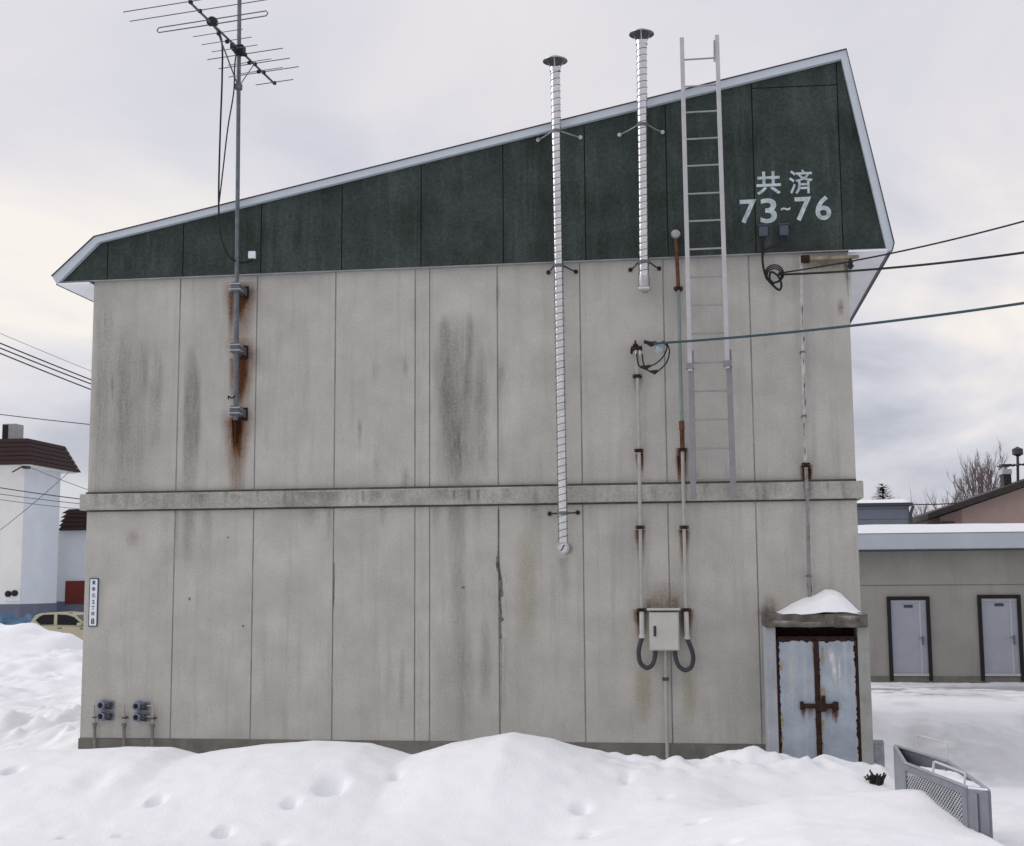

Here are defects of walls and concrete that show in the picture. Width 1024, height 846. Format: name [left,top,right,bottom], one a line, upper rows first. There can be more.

corrosion [230,290,251,317]
corrosion [238,345,251,399]
corrosion [229,417,246,461]
crack [495,511,503,640]
corrosion [778,640,860,762]